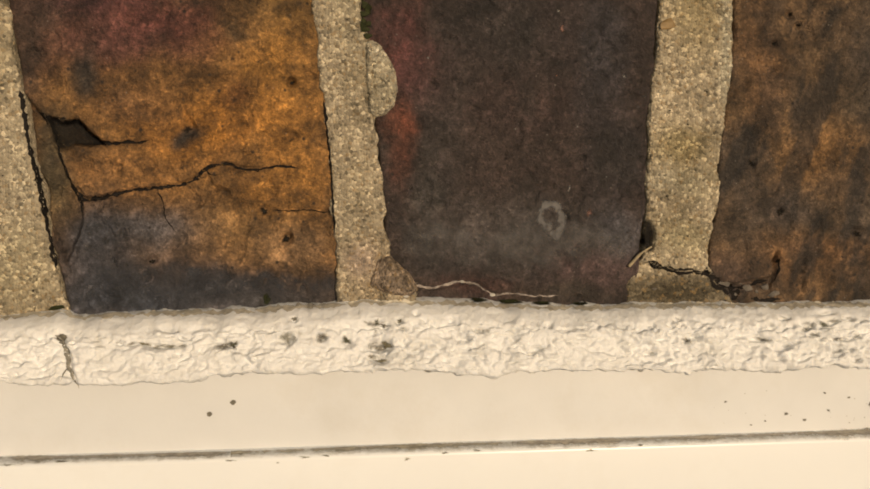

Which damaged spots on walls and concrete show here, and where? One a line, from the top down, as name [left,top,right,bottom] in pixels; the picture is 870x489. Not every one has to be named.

spalling [36,109,104,206]
crack [91,135,148,145]
crack [78,162,296,232]
crack [648,258,781,303]
crack [55,334,79,388]